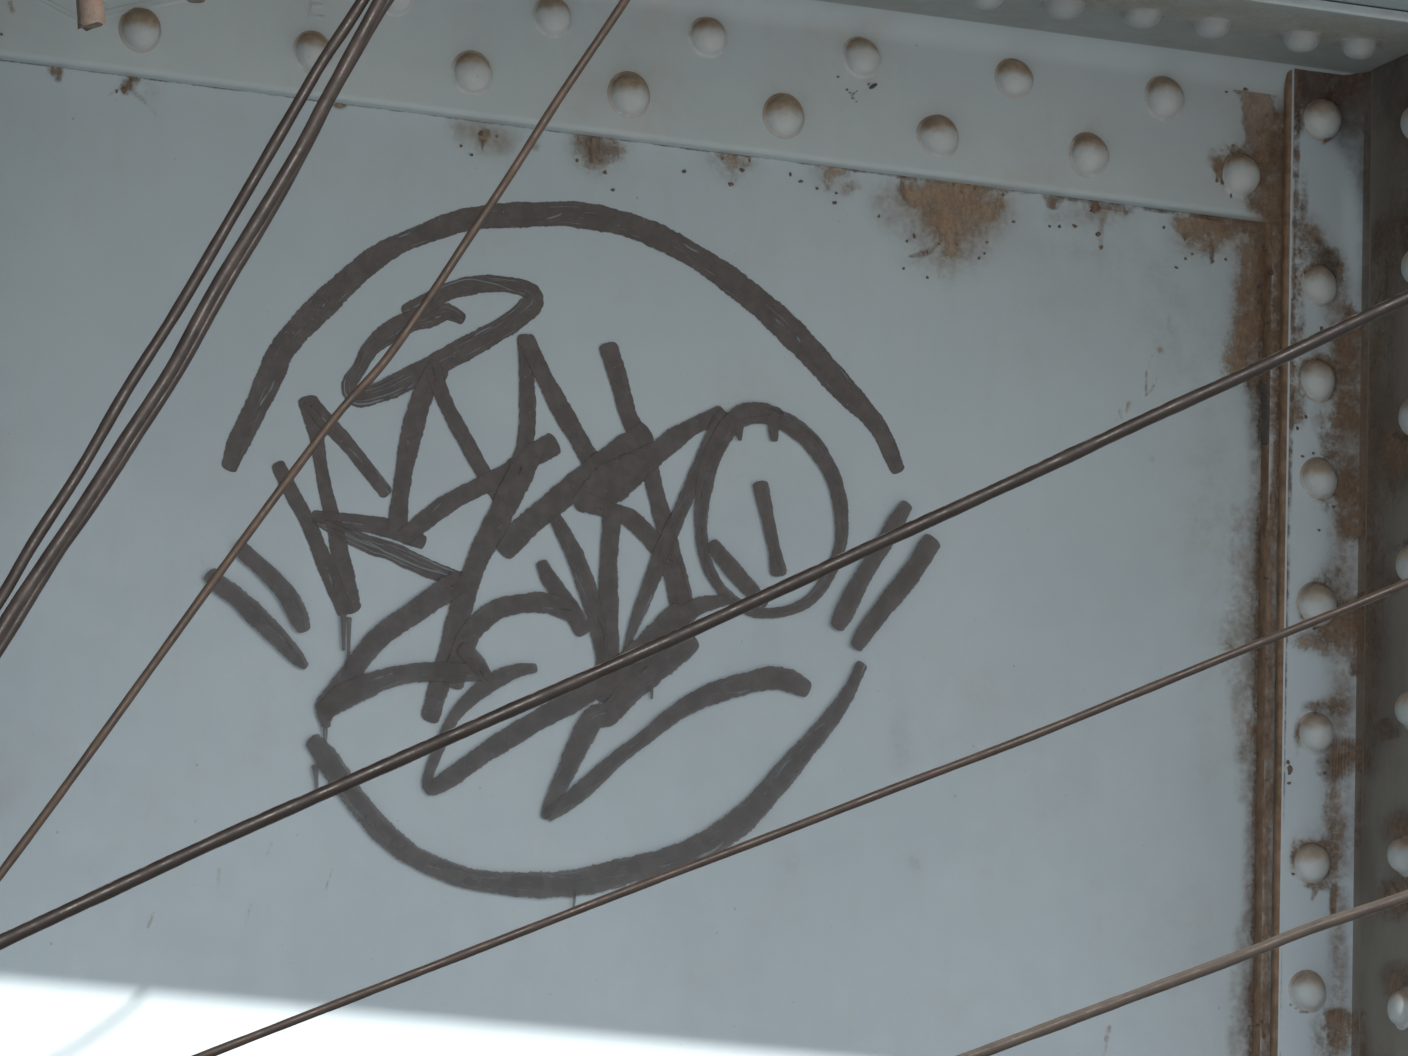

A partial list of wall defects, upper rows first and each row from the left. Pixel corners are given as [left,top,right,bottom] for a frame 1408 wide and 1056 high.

rust [460,129,498,156]
rust [575,134,624,192]
rust [789,167,856,205]
rust [899,177,1016,270]
rust [1163,68,1370,1056]